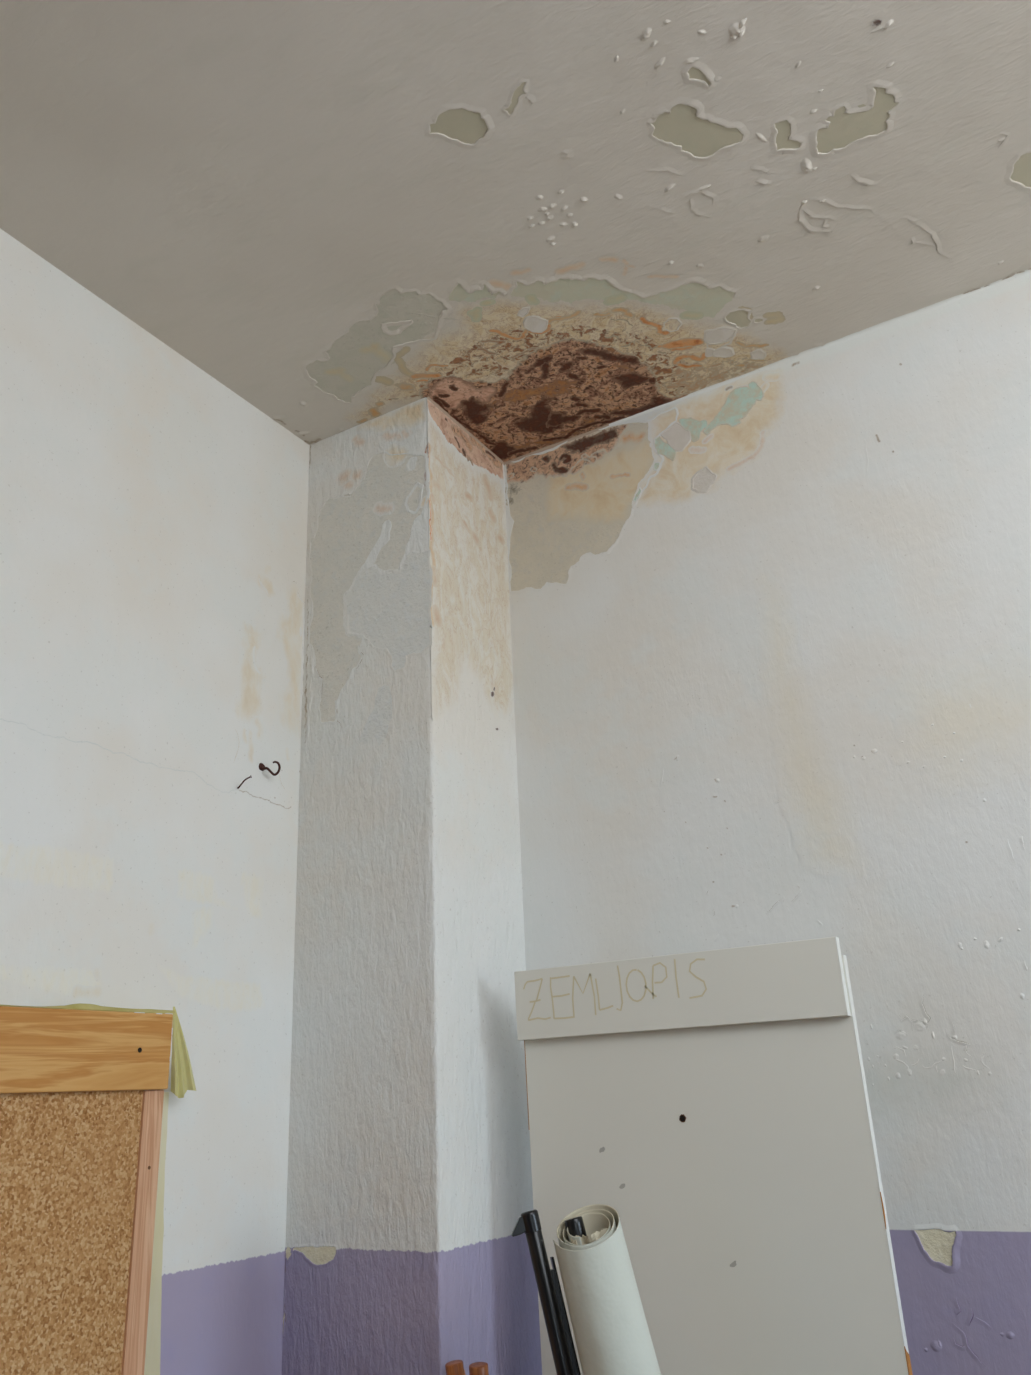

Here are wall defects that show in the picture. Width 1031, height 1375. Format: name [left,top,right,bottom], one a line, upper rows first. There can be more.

peeling [424,78,537,150]
peeling [645,57,750,162]
peeling [769,79,906,159]
peeling [1003,148,1031,199]
water stain [341,267,795,722]
peeling [504,381,764,595]
peeling [910,1223,963,1274]